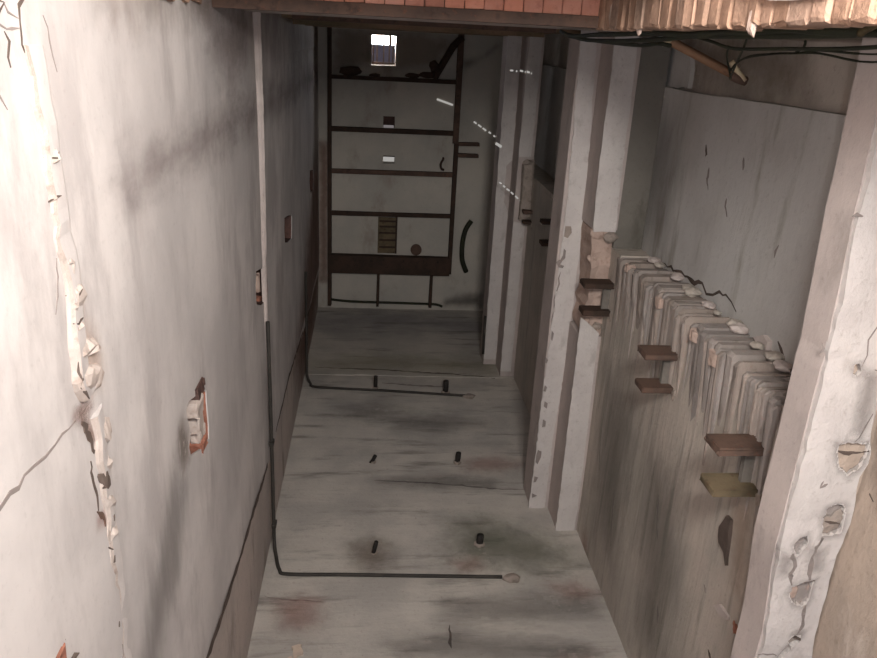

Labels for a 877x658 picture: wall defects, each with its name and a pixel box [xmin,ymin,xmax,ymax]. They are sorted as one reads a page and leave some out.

crack [0,0,25,68]
crack [43,15,57,71]
spalling [23,44,105,402]
spalling [572,221,619,335]
crack [662,262,736,312]
crack [77,362,90,399]
crack [0,420,116,563]
spalling [90,403,132,658]
spalling [822,505,843,533]
spalling [838,443,869,473]